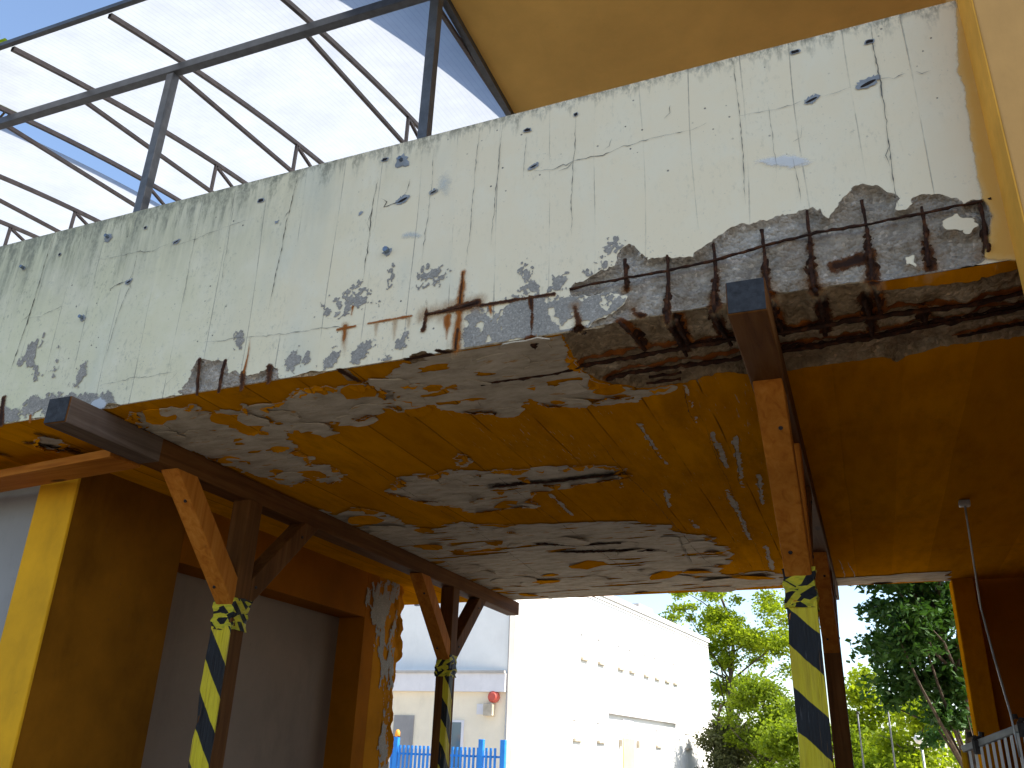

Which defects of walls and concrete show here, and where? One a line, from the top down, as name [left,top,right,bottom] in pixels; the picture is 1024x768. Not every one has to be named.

crack [467,107,697,249]
crack [872,37,928,206]
corrosion [336,270,556,353]
spalling [4,183,1024,487]
peeling [319,453,784,600]
peeling [836,571,953,585]
spalling [362,577,404,768]